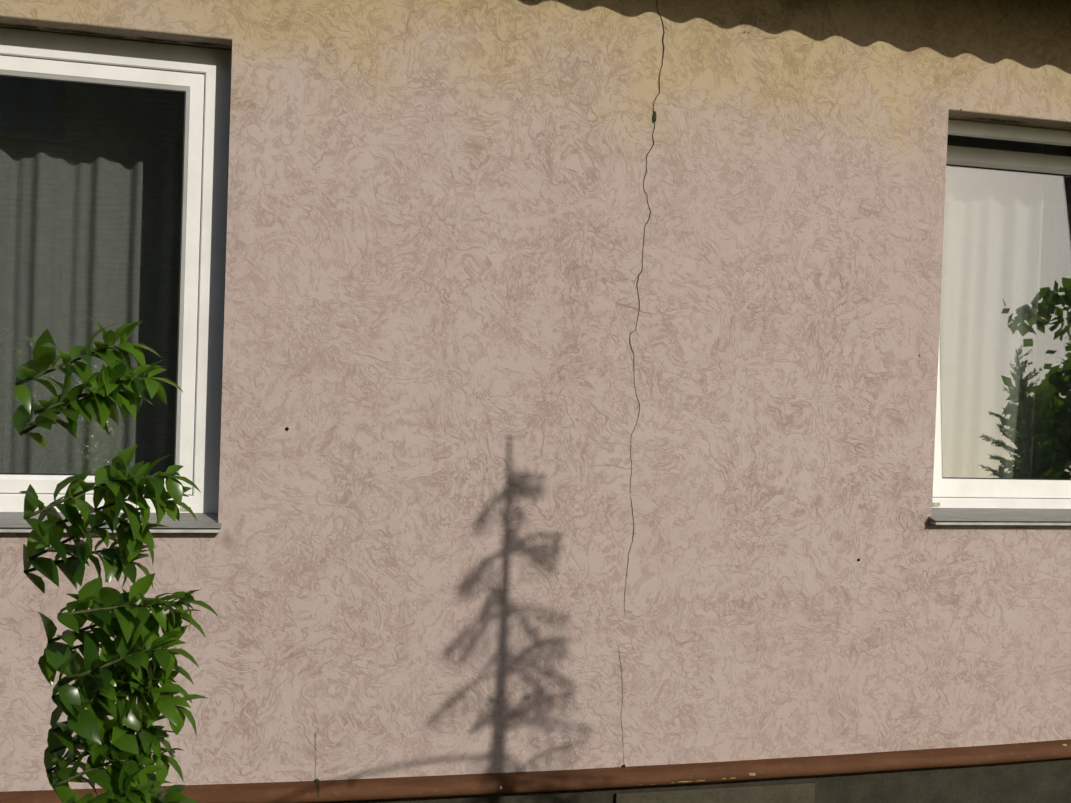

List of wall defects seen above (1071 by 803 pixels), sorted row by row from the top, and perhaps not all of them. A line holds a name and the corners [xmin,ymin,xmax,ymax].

crack [590,0,669,610]
crack [618,652,626,767]